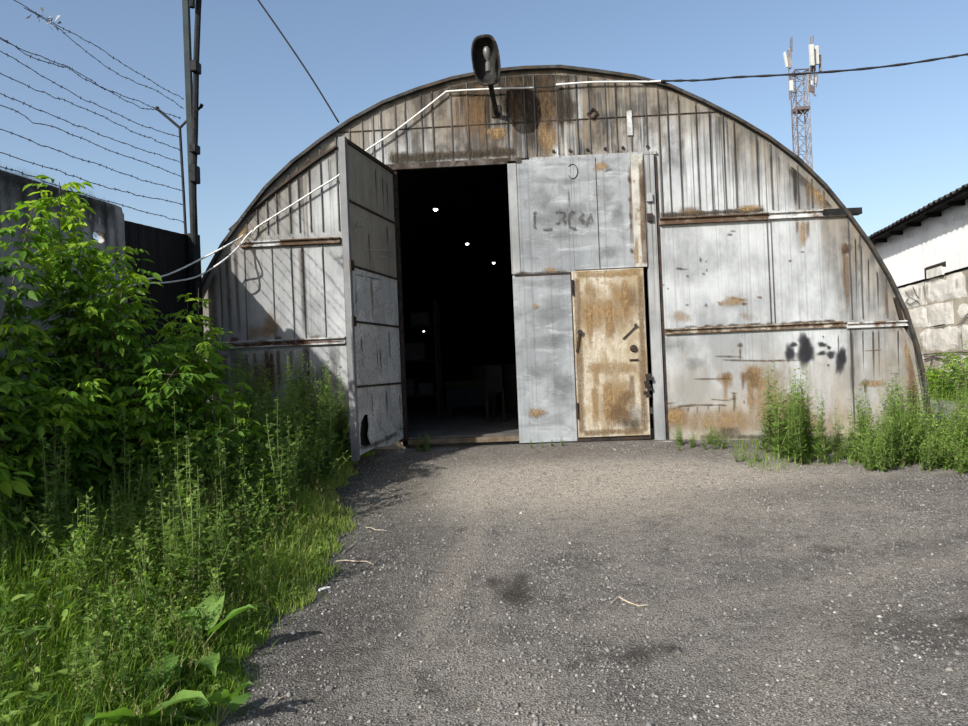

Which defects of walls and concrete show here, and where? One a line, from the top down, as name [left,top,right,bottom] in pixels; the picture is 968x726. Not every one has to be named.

corrosion [456,75,575,151]
corrosion [575,160,648,435]
corrosion [231,317,340,392]
corrosion [668,344,794,435]